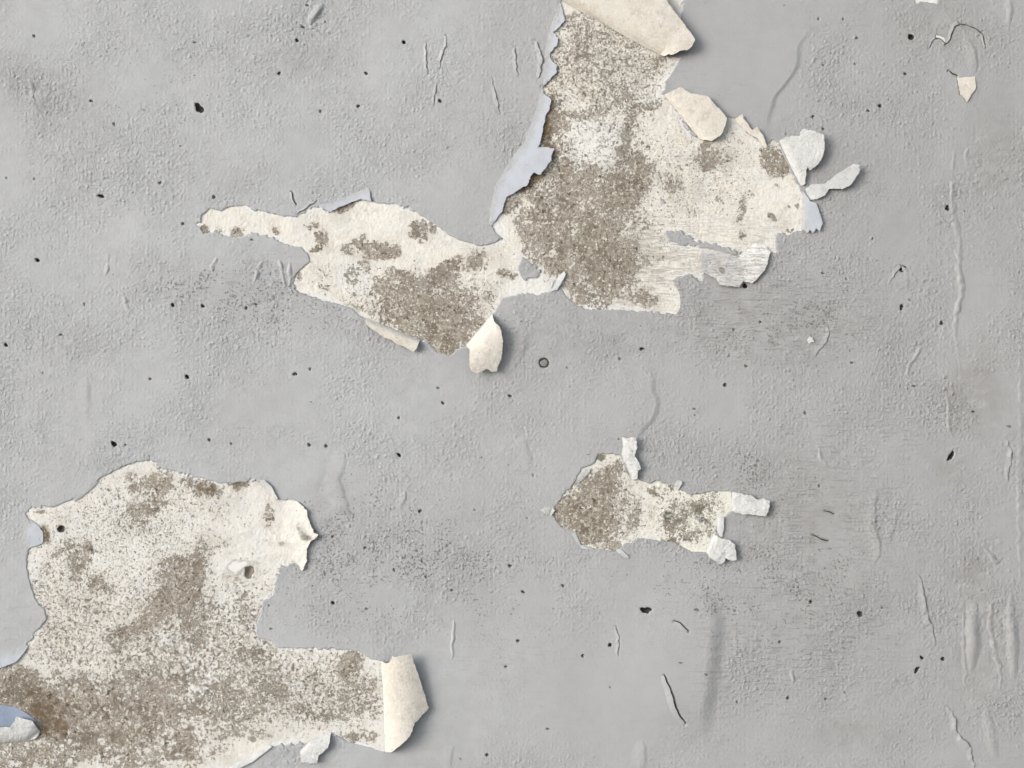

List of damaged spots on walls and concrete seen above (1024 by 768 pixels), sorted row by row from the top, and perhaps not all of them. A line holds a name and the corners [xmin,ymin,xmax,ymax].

crack [928,21,986,48]
peeling [956,76,976,102]
peeling [195,0,860,374]
peeling [541,437,770,564]
peeling [0,460,429,768]
crack [674,621,689,632]
crack [661,675,686,724]